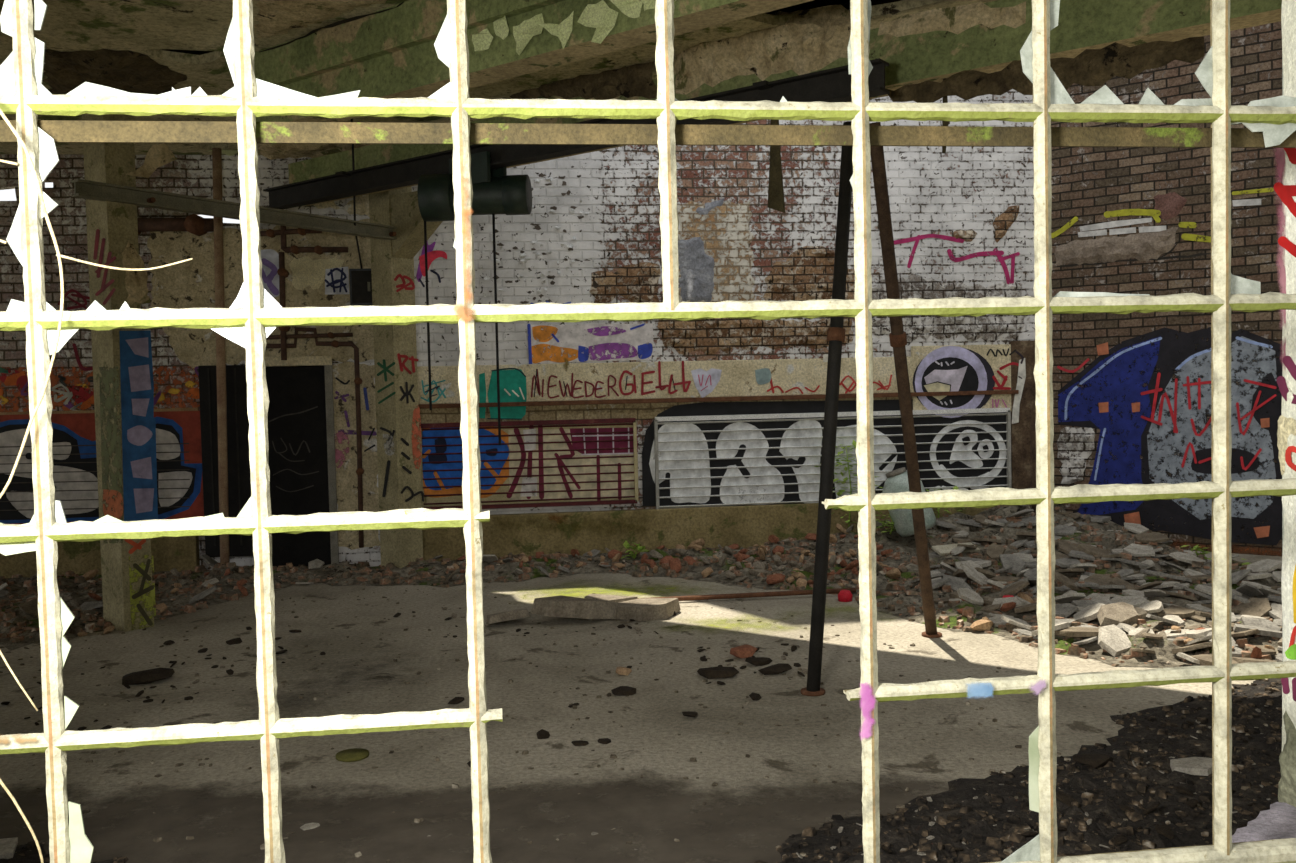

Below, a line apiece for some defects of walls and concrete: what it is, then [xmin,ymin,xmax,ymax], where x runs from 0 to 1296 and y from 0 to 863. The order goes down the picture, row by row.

peeling [472,0,656,55]
spalling [673,5,851,95]
spalling [502,61,657,100]
spalling [477,173,661,304]
spalling [953,229,977,242]
spalling [993,205,1019,243]
spalling [763,246,855,301]
spalling [872,274,1023,300]
spalling [658,317,854,355]
spalling [872,314,1028,344]